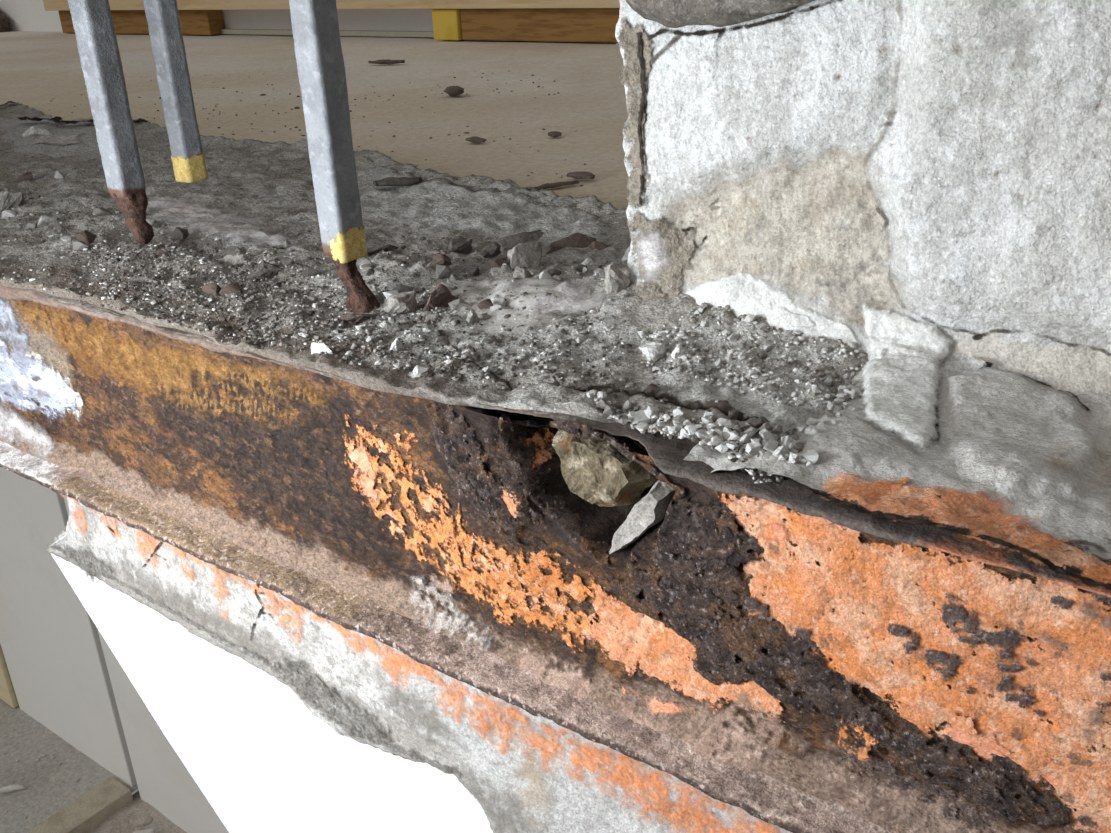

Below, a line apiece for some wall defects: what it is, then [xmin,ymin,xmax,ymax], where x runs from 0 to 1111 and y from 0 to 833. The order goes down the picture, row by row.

spalling [147,198,287,248]
spalling [617,17,900,327]
peeling [0,299,83,418]
spalling [451,278,603,338]
crack [1048,337,1110,356]
damp [0,409,86,480]
corrosion [20,301,597,680]
crack [142,542,162,567]
crack [251,583,277,640]
corrosion [137,526,778,833]
corrosion [886,593,1043,717]
corrosion [795,679,1045,833]